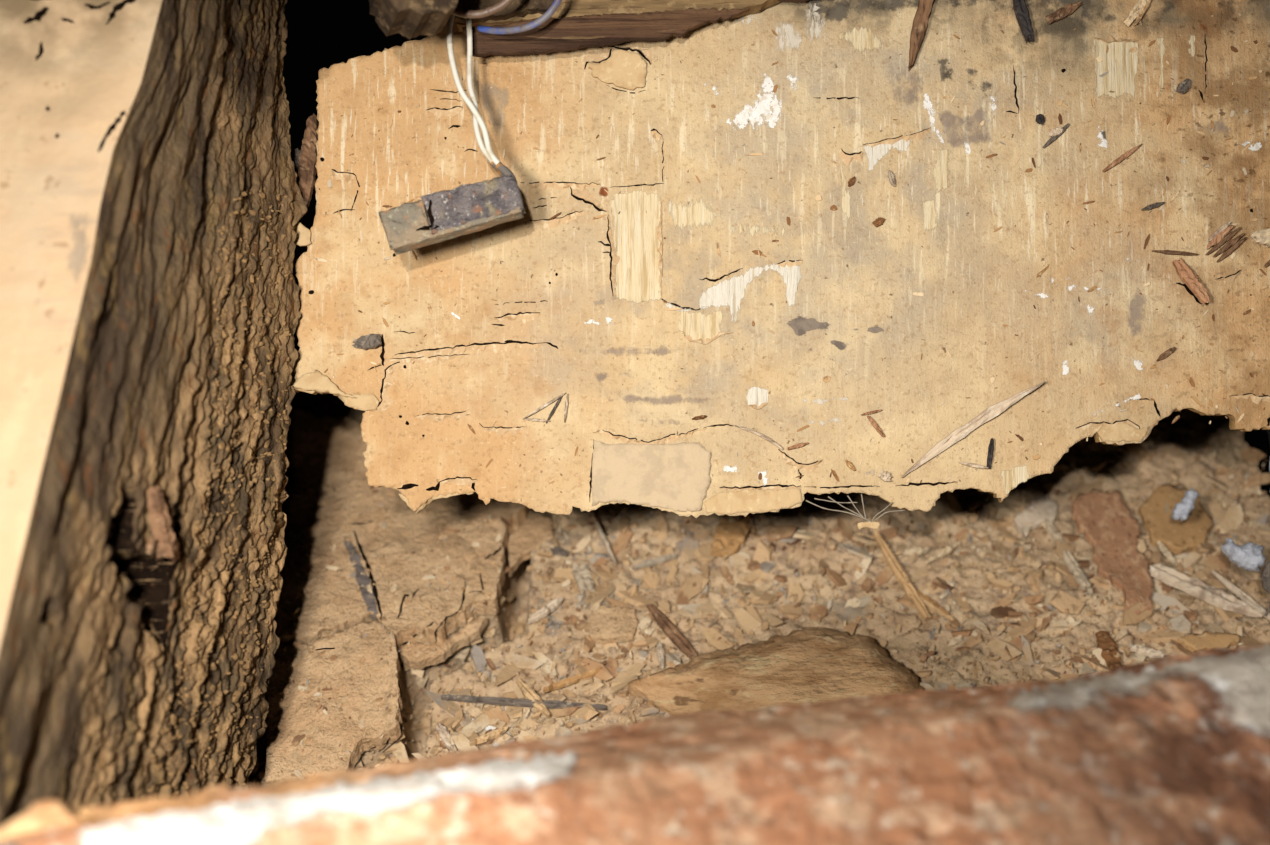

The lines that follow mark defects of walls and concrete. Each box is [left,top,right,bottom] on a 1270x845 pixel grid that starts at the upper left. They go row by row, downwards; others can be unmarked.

peeling [1094,36,1138,99]
peeling [1157,38,1165,94]
crack [521,128,664,296]
peeling [610,190,802,344]
water stain [1025,278,1109,313]
peeling [290,369,379,411]
crack [369,300,558,436]
peeling [746,387,768,410]
crack [589,424,733,498]
peeling [591,440,802,514]
peeling [1001,465,1031,494]
peeling [1096,422,1149,442]